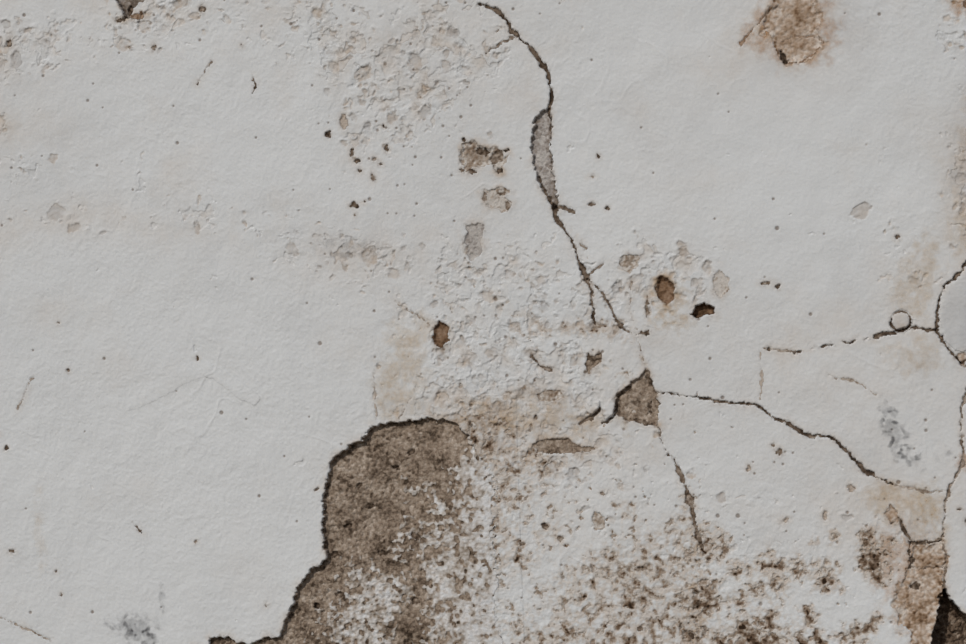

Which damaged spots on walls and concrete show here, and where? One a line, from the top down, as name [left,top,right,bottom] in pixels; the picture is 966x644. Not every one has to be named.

flaking render [116,0,144,22]
flaking render [739,0,824,66]
spalling [476,148,510,174]
crack [478,3,644,361]
flaking render [581,319,619,336]
crack [530,355,552,372]
crack [578,407,617,425]
flaking render [585,368,661,427]
crack [656,263,966,589]
flaking render [210,386,884,644]
flaking render [854,504,950,644]